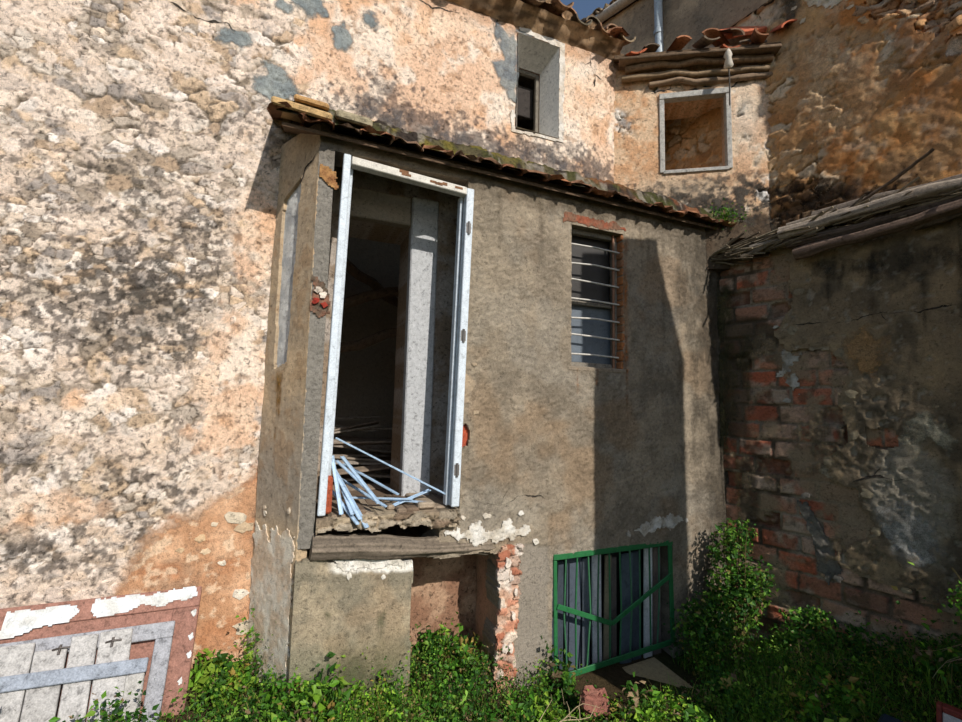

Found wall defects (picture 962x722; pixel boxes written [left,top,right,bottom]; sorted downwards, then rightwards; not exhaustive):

spalling [791,0,962,56]
peeling [794,32,892,146]
flaking render [719,252,962,657]
peeling [626,513,688,537]
spalling [444,510,539,695]